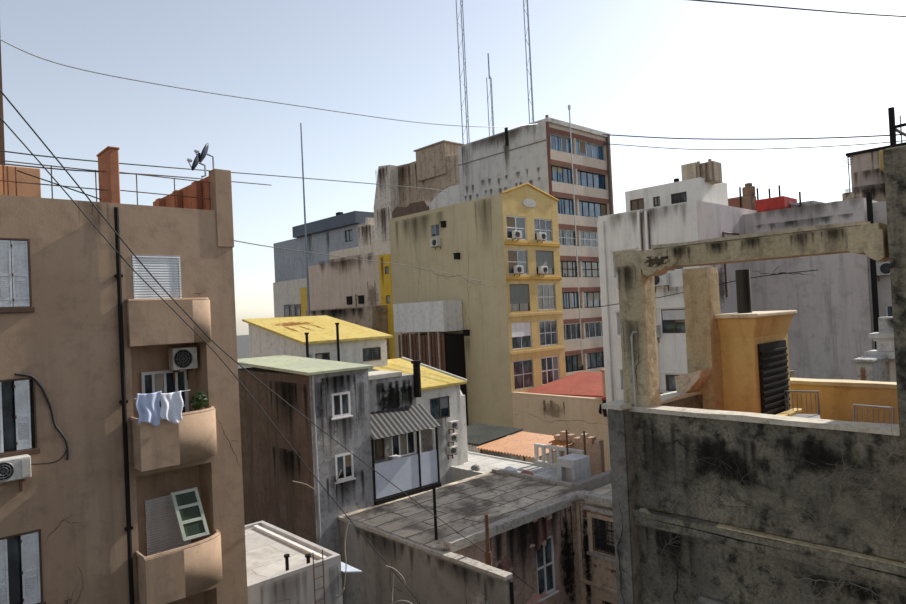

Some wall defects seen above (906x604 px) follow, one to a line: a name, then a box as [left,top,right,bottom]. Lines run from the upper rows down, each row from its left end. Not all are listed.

damp [844,169,885,197]
damp [376,381,412,410]
damp [270,375,364,460]
damp [643,423,758,489]
damp [783,438,873,472]
damp [646,527,692,566]